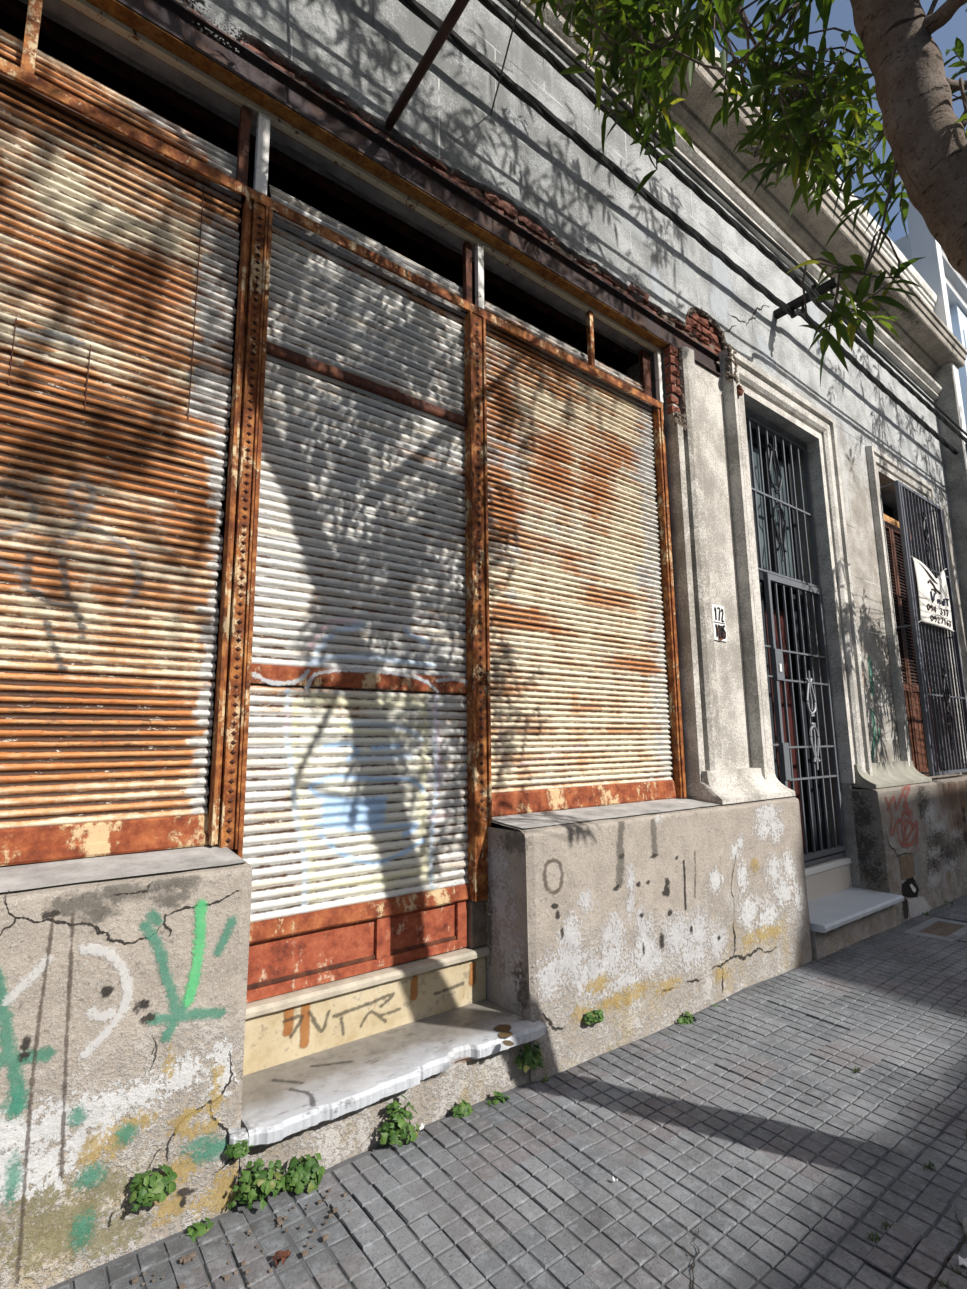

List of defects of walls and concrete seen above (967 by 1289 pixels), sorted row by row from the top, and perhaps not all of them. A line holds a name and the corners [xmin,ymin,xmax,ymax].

crack [0,881,240,945]
crack [663,850,777,993]
corrosion [410,975,418,1000]
corrosion [283,1003,310,1048]
crack [148,1034,158,1072]